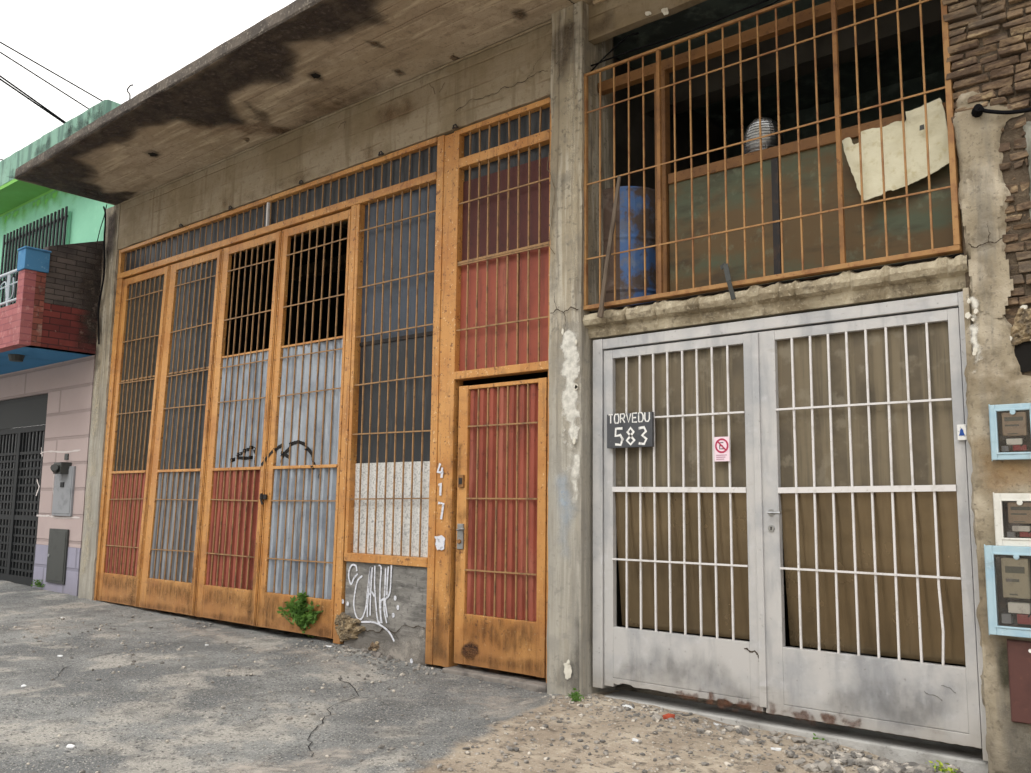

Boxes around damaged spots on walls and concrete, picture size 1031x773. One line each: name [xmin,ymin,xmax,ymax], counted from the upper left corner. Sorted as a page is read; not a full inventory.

leakage [10,0,381,256]
spalling [998,117,1031,372]